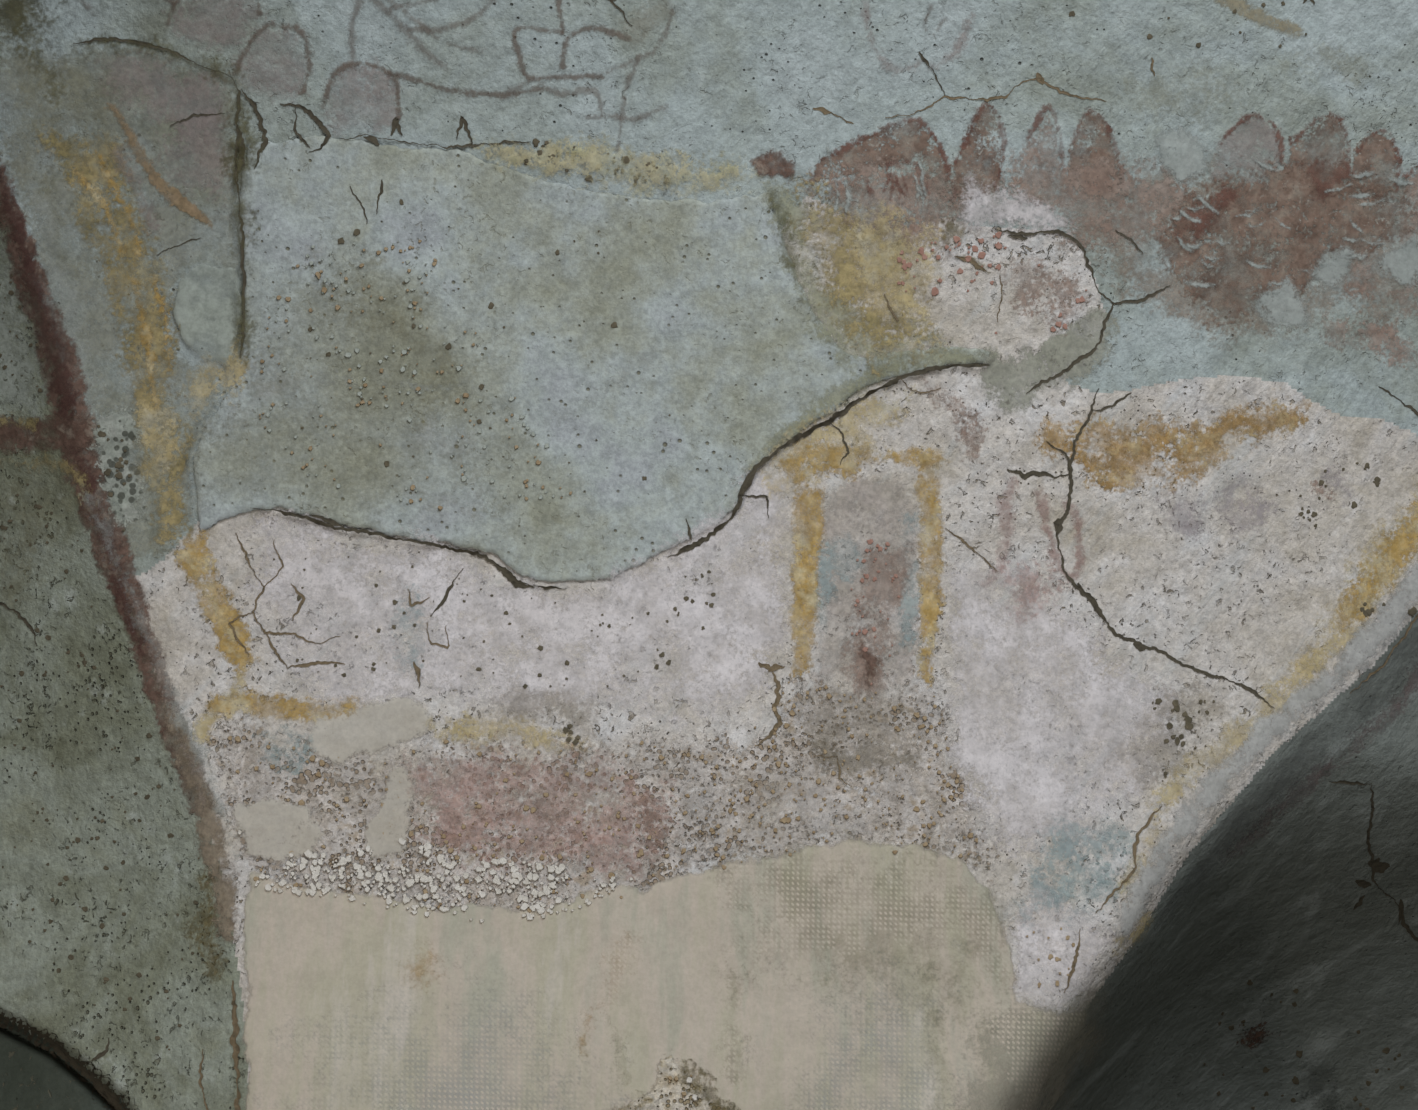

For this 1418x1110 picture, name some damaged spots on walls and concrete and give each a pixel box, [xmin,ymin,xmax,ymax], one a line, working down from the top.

crack [954,256,1003,322]
crack [668,363,990,557]
crack [996,229,1274,708]
crack [228,508,565,687]
crack [946,528,998,572]
crack [1329,780,1418,941]
flaking render [618,1056,738,1110]